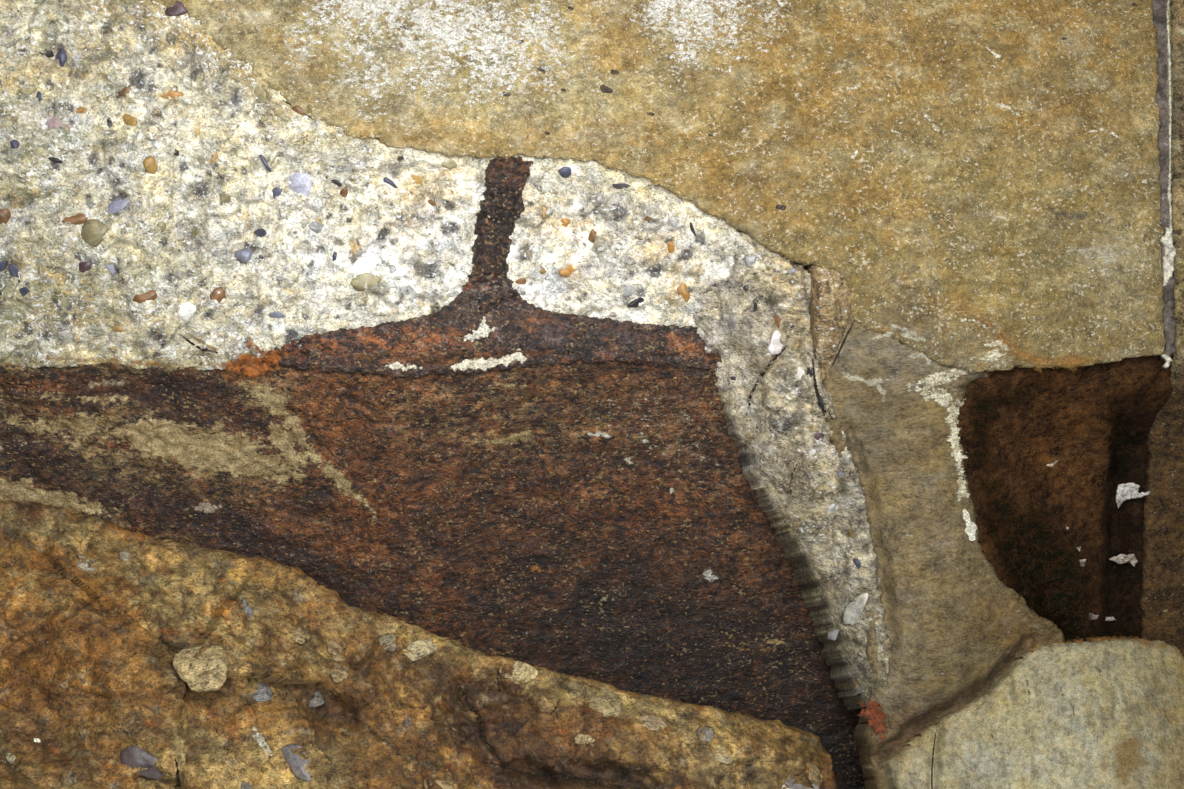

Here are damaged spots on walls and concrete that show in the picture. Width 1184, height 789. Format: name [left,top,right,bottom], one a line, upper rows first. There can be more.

leakage [843,372,889,401]
leakage [873,325,1146,643]
crack [173,758,181,789]